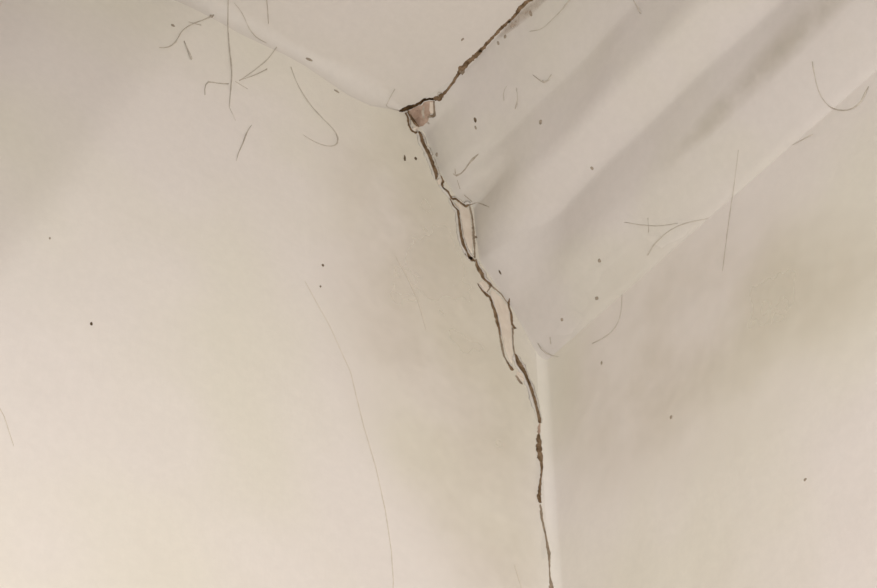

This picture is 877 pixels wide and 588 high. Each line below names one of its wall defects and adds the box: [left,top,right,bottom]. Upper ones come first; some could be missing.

flaking render [406,101,436,131]
crack [399,0,554,588]